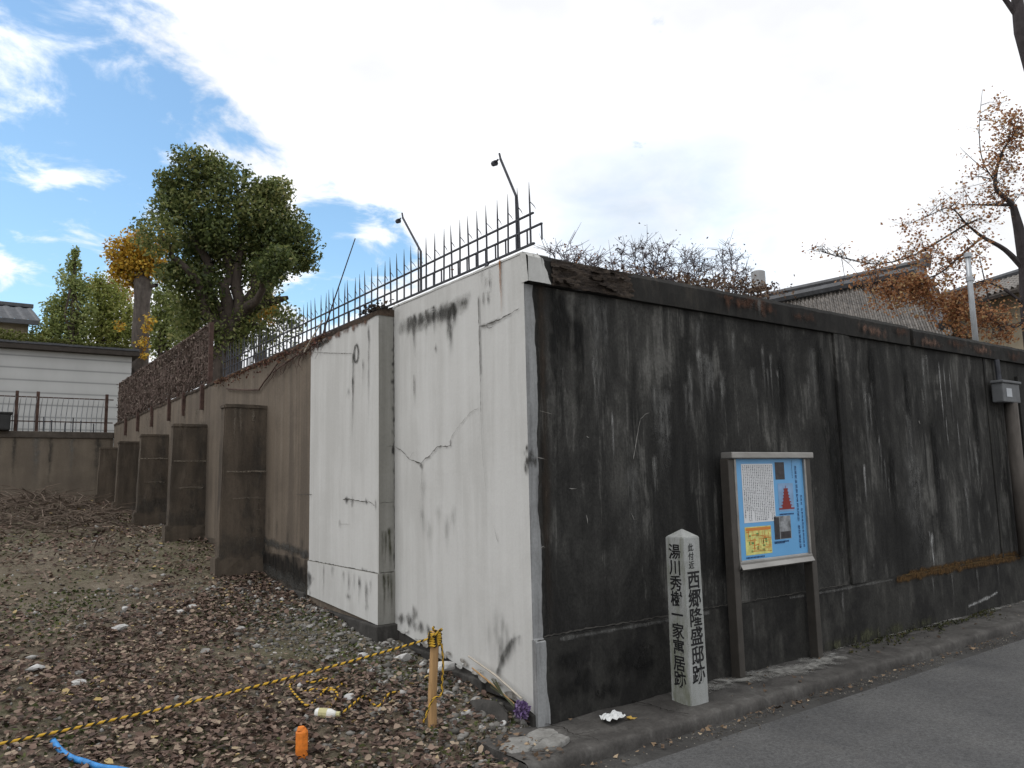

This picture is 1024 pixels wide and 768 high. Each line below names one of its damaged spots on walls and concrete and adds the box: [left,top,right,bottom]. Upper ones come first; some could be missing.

leakage [407,301,466,340]
crack [396,299,519,485]
leakage [921,357,980,474]
leakage [262,538,310,593]